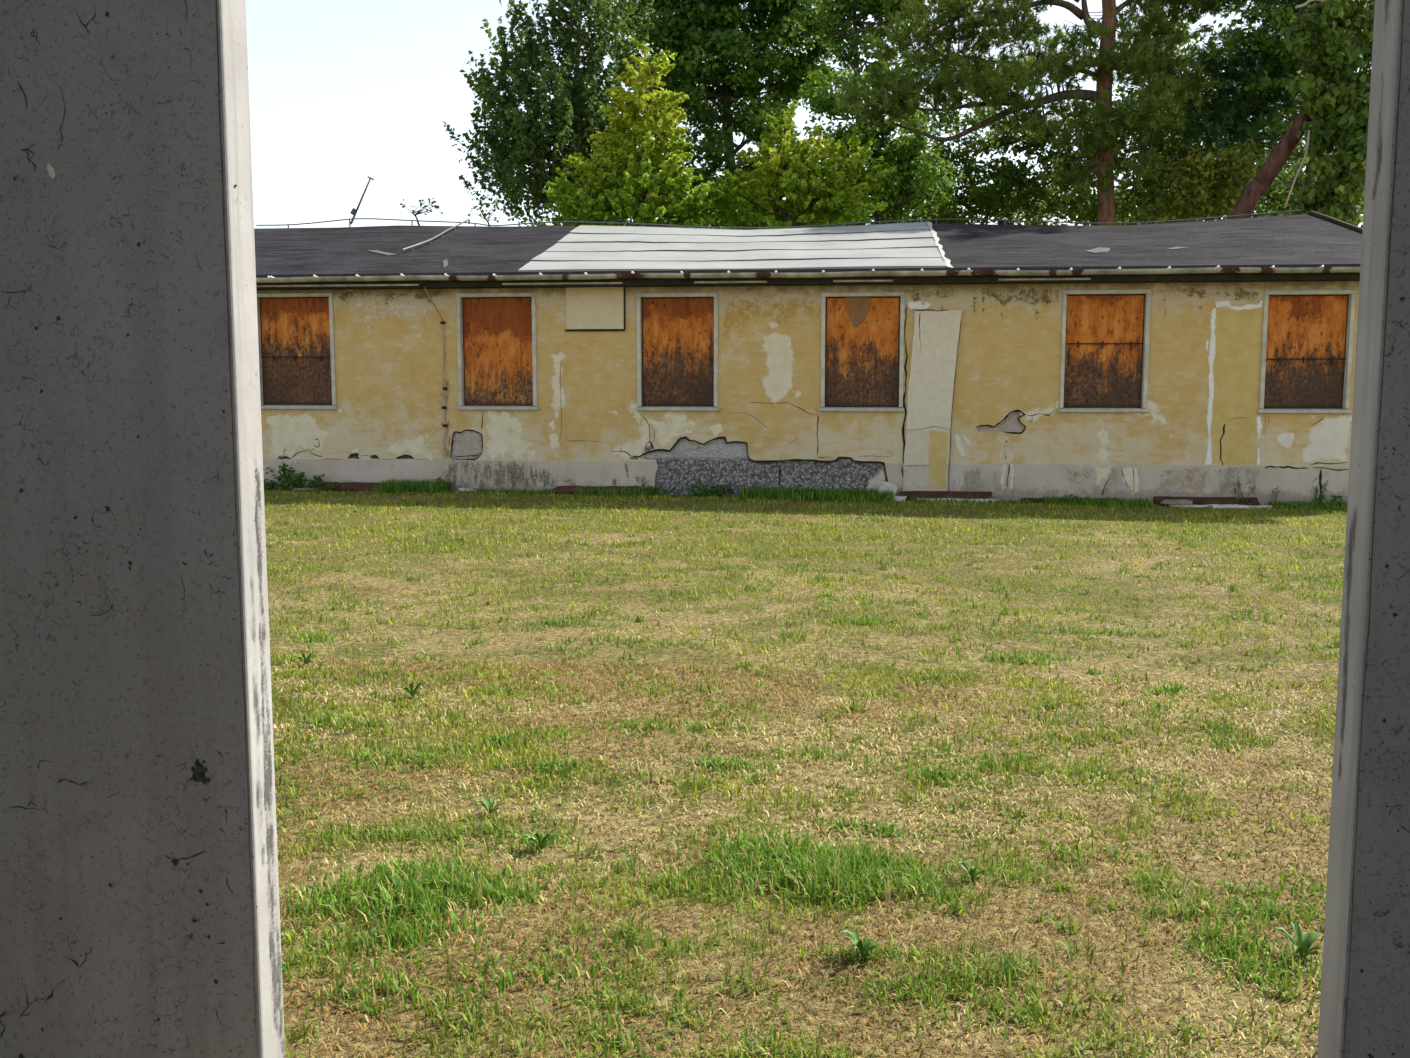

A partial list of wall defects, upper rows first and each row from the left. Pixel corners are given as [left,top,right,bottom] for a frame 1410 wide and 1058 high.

peeling [265,352,567,461]
spalling [608,402,888,496]
peeling [761,321,801,404]
spalling [955,410,1026,457]